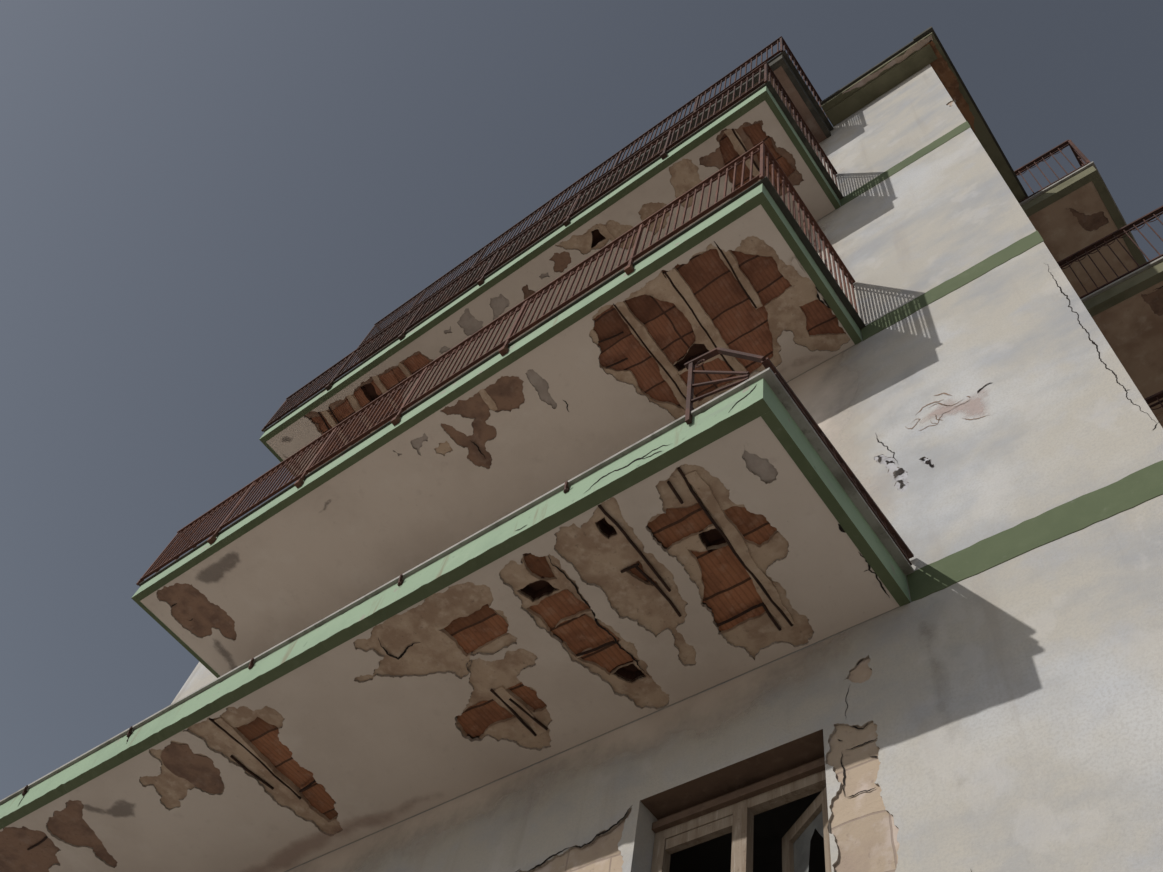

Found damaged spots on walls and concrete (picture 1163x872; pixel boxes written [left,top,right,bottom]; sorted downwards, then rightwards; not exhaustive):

spalling [539,120,803,279]
spalling [304,351,433,472]
spalling [393,369,557,469]
spalling [589,236,850,419]
crack [1047,264,1163,430]
spalling [157,583,237,640]
spalling [354,582,552,749]
spalling [499,464,814,708]
spalling [0,800,118,872]
spalling [140,706,342,835]
spalling [533,811,631,872]
spalling [826,722,900,872]